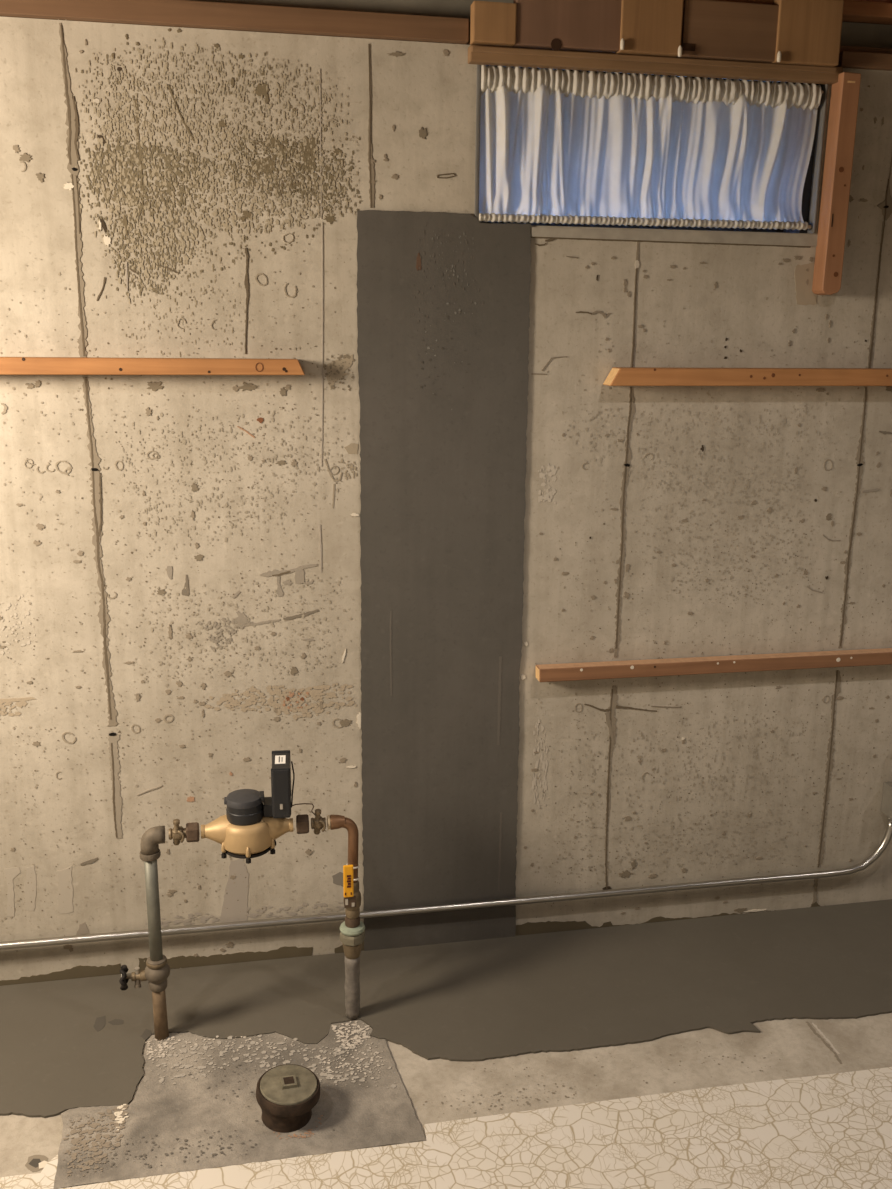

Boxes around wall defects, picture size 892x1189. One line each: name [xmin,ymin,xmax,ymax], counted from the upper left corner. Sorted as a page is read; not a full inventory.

crack [60,25,179,838]
leakage [64,37,362,357]
crack [531,237,811,648]
crack [818,179,889,867]